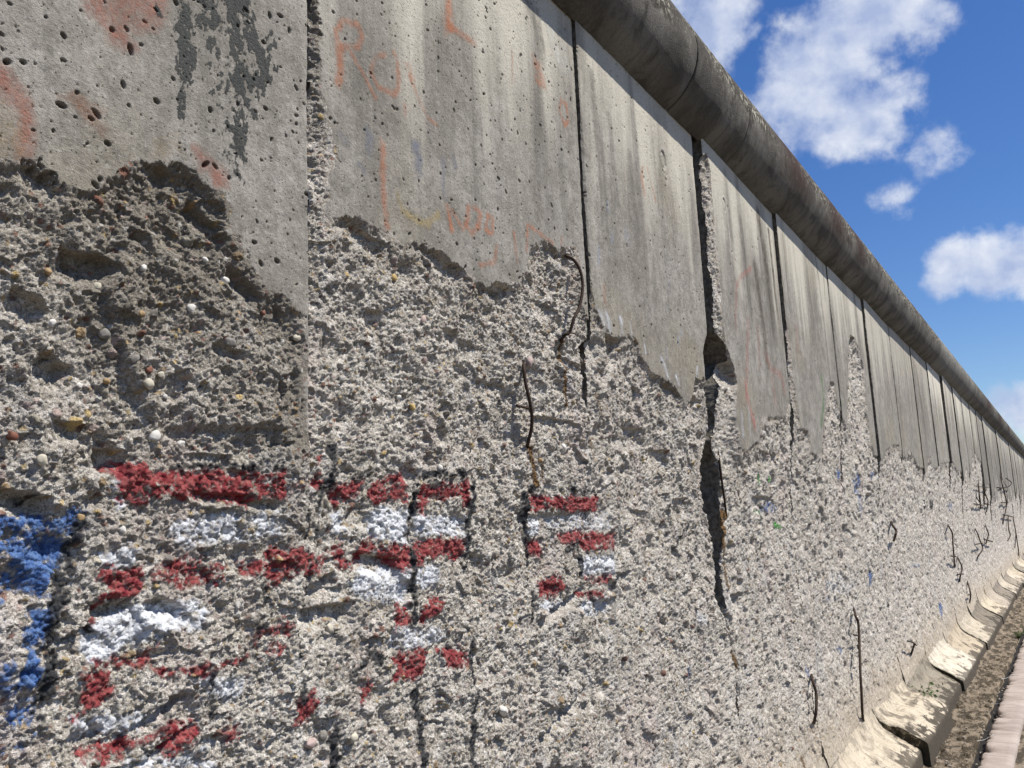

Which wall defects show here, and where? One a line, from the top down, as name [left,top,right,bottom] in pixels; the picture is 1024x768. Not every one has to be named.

spalling [0,0,603,768]
corrosion [527,446,544,488]
corrosion [556,339,568,407]
spalling [584,153,1024,768]